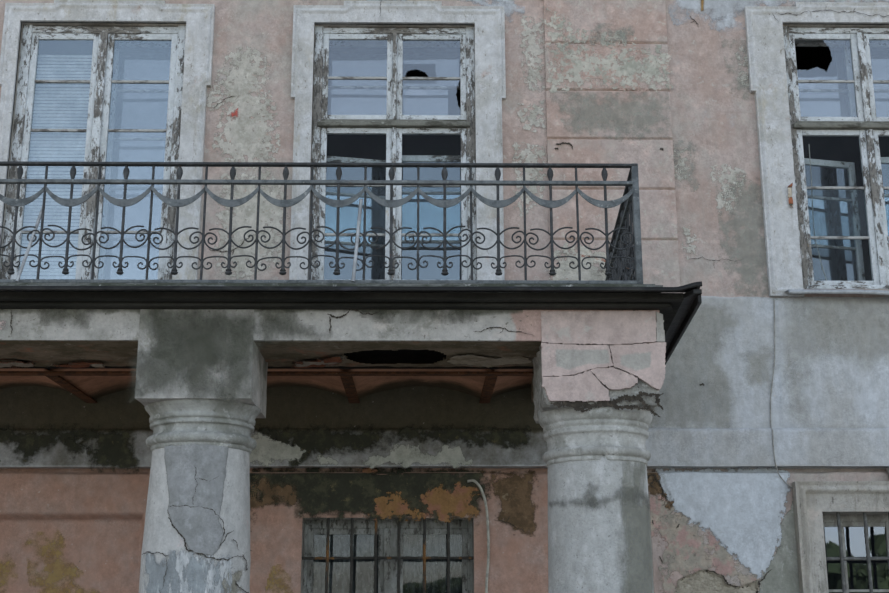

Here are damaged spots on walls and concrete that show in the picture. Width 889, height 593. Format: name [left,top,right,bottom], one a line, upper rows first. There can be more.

peeling [669,0,889,31]
peeling [466,0,673,133]
peeling [206,46,290,280]
peeling [512,142,547,217]
crack [473,311,666,402]
damp [0,423,140,474]
peeling [144,444,242,593]
crack [142,467,251,593]
peeling [249,432,306,514]
damp [250,424,531,525]
peeling [357,443,473,473]
peeling [647,469,800,593]